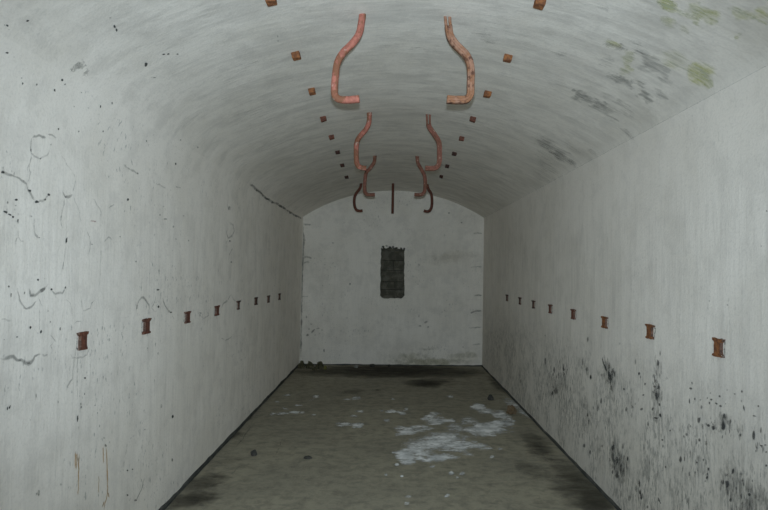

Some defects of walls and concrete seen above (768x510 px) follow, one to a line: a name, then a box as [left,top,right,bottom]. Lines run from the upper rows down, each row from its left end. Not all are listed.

damp [392,400,529,467]